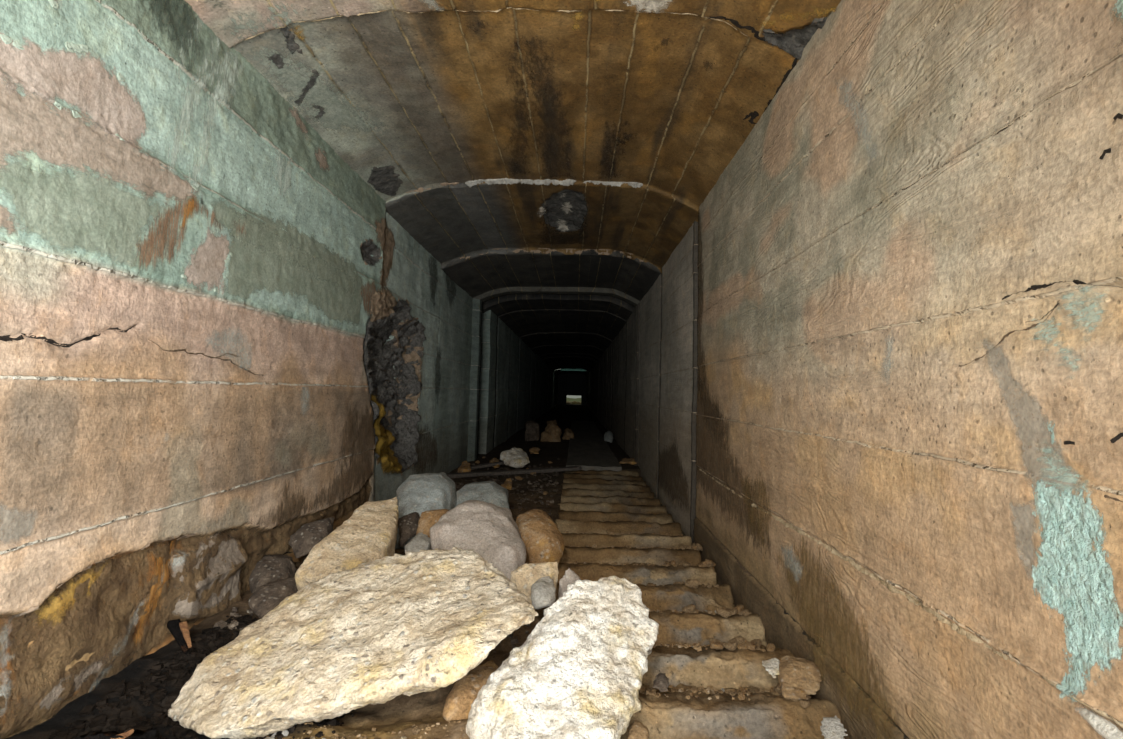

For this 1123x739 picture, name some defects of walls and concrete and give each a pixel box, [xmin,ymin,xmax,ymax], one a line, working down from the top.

efflorescence [602,0,750,38]
crack [708,16,783,41]
spalling [762,8,837,60]
peeling [0,33,198,201]
crack [743,58,797,124]
corrosion [138,198,221,267]
crack [0,324,263,376]
spalling [363,288,426,476]
crack [955,280,1122,367]
corrosion [39,573,99,622]
corrosion [132,537,179,643]
spalling [0,479,372,739]